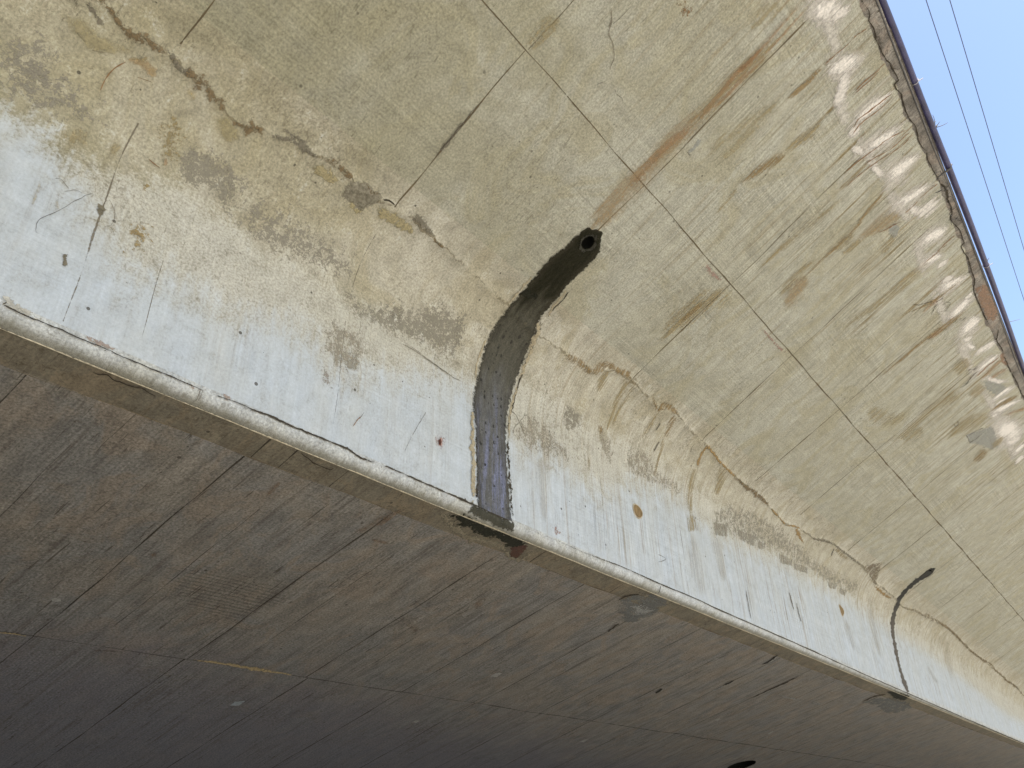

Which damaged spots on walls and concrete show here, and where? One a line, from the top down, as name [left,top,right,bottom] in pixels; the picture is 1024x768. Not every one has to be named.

corrosion [591,4,803,228]
corrosion [719,125,820,210]
corrosion [789,29,866,98]
corrosion [847,131,911,186]
corrosion [782,184,937,304]
corrosion [846,236,954,327]
water stain [806,0,1024,464]
crack [5,305,508,520]
crack [546,536,1024,744]